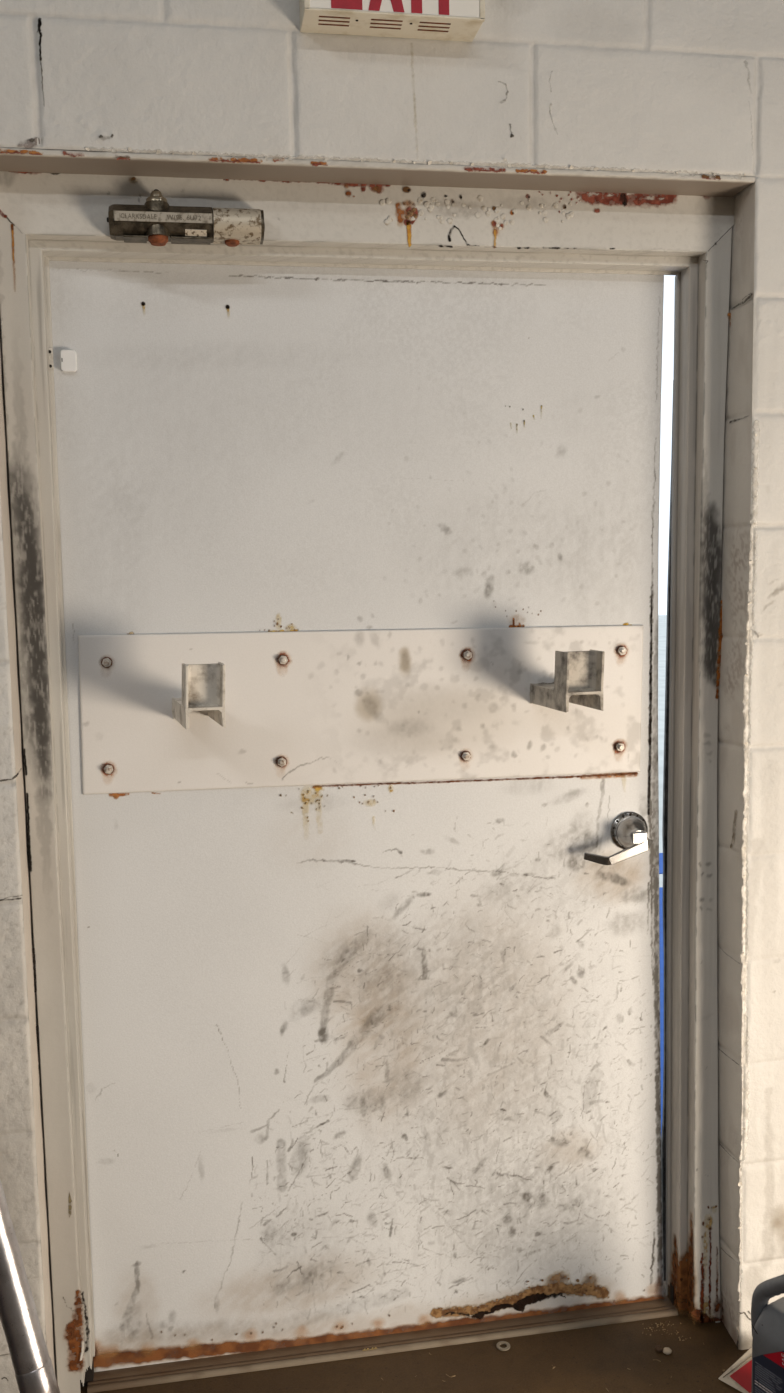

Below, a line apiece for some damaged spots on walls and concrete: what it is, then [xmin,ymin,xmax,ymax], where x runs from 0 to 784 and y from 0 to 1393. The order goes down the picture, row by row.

corrosion [209,157,279,182]
corrosion [311,161,426,247]
corrosion [563,192,677,213]
corrosion [291,772,638,822]
corrosion [63,1206,723,1371]
peeling [439,1276,601,1311]